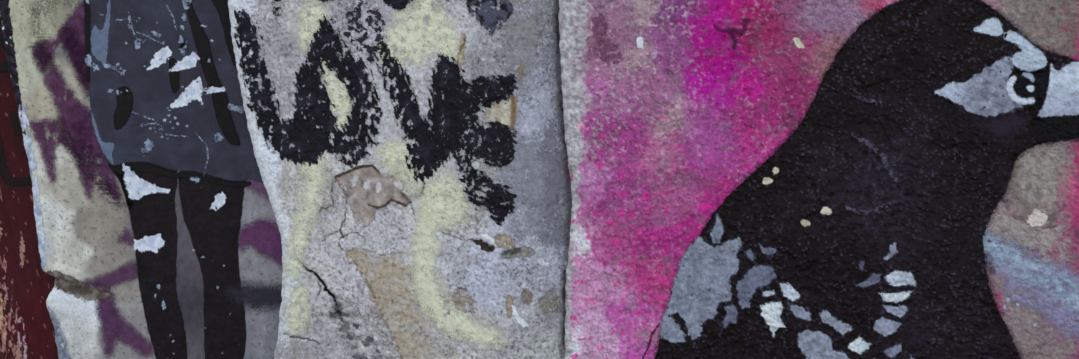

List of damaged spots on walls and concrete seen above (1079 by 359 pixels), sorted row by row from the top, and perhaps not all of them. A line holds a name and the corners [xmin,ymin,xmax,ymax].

crack [317,179,364,249]
spalling [334,164,413,228]
crack [301,263,343,322]